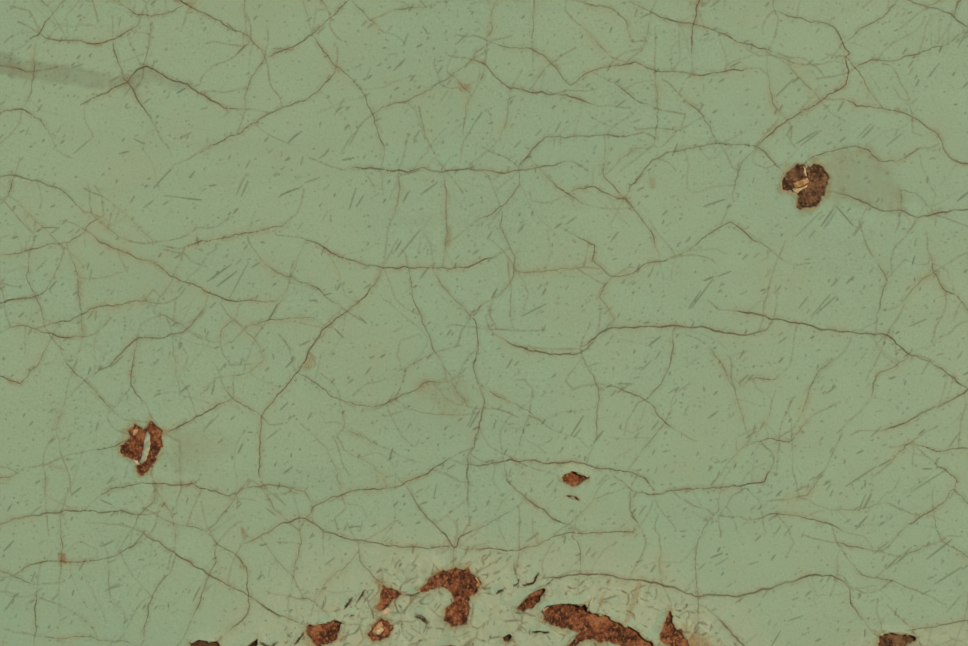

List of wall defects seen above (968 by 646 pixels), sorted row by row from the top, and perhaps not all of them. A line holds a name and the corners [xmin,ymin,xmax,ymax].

crack [37,9,248,145]
crack [764,33,918,140]
crack [275,287,371,398]
crack [512,311,855,355]
crack [477,459,768,495]
crack [42,483,227,516]
crack [333,509,521,551]
crack [165,547,291,624]
crack [553,573,770,597]
peeling [530,621,550,633]